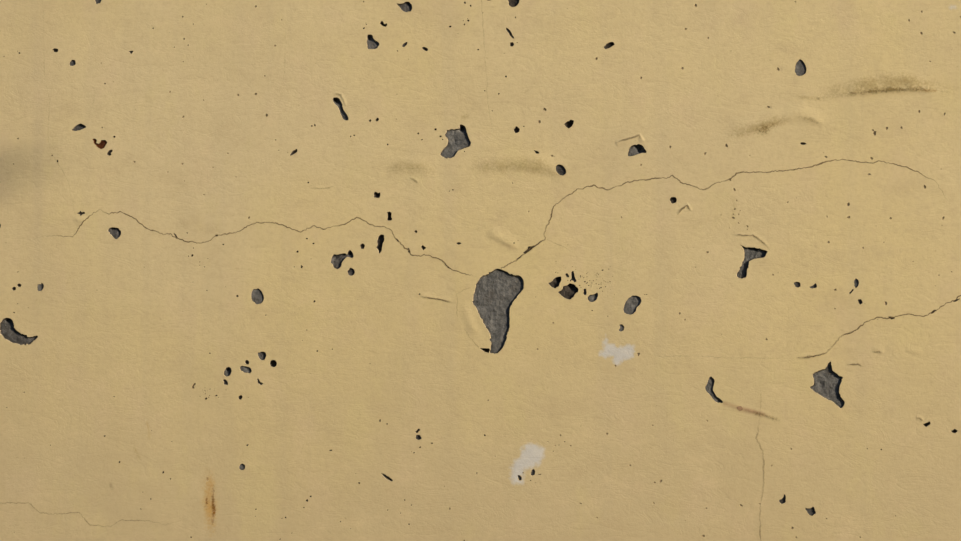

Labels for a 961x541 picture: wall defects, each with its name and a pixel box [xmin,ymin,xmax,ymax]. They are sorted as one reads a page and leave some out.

spalling [434,124,471,159]
crack [501,159,926,268]
crack [74,211,466,275]
spalling [736,245,768,279]
spalling [0,303,38,346]
spalling [472,269,524,354]
crack [845,295,961,335]
spalling [705,377,723,403]
spalling [810,362,845,409]
rust [197,462,222,541]